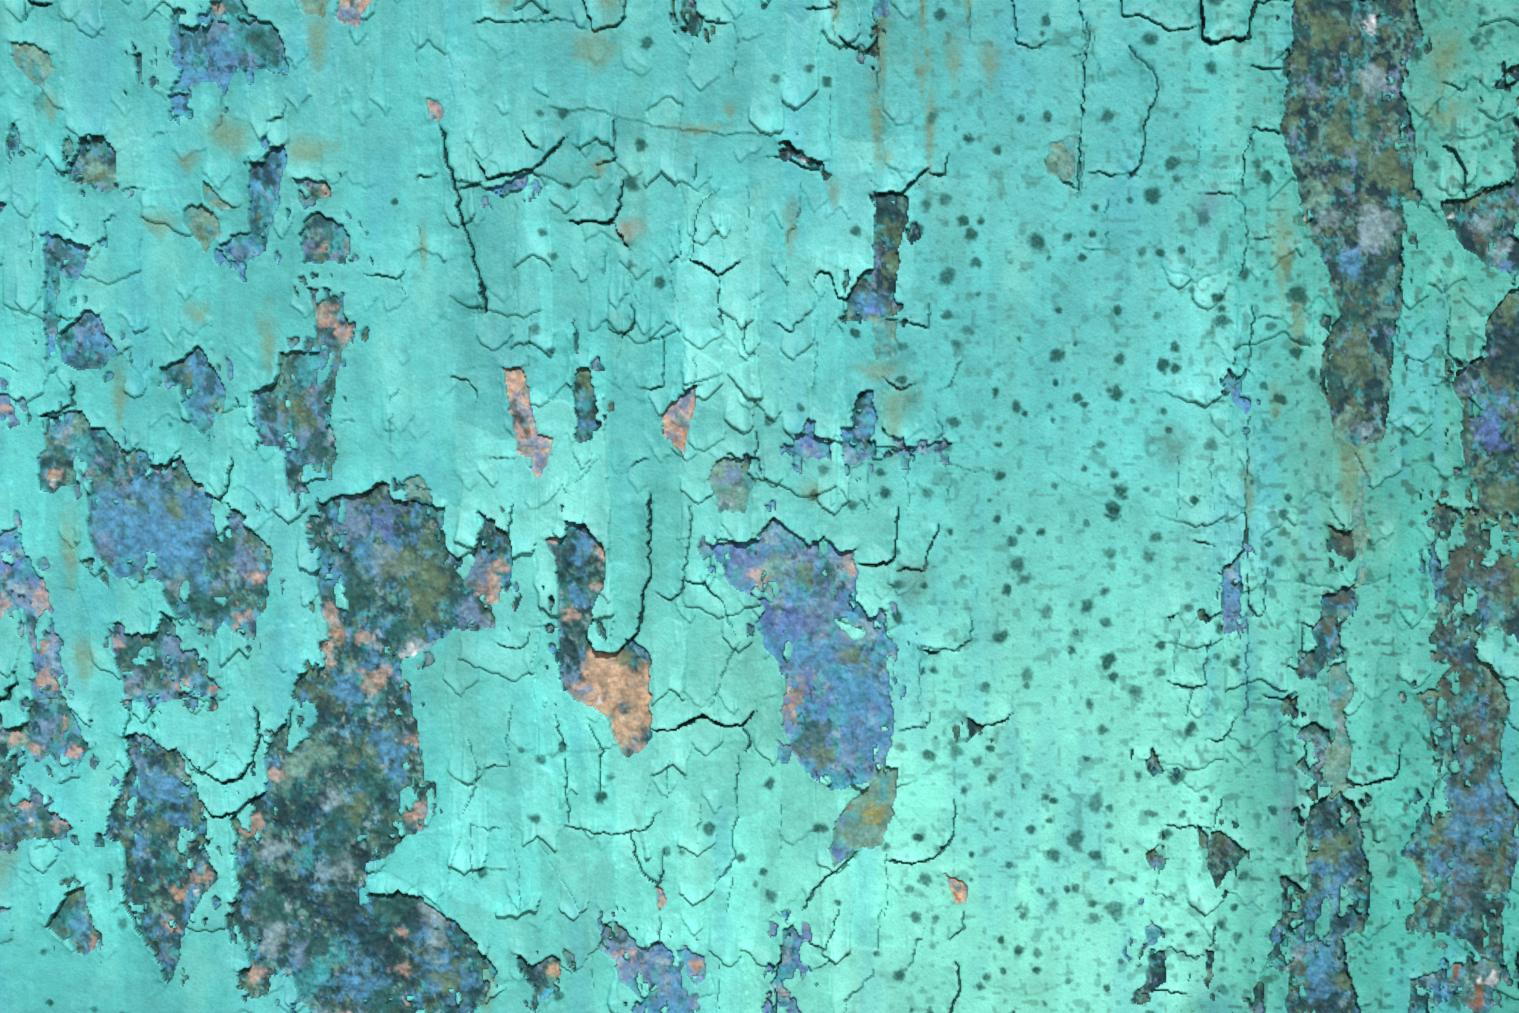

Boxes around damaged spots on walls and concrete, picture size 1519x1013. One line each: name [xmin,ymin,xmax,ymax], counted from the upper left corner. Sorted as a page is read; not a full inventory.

peeling [670,0,720,44]
crack [363,94,874,397]
crack [184,706,294,819]
peeling [0,127,720,1013]
crack [462,430,758,942]
peeling [698,390,956,868]
crack [762,799,966,1013]
crack [858,303,1000,572]
peeling [1122,898,1170,1005]
crack [1011,0,1329,849]
peeling [1197,819,1256,899]
peeling [1232,0,1519,1013]